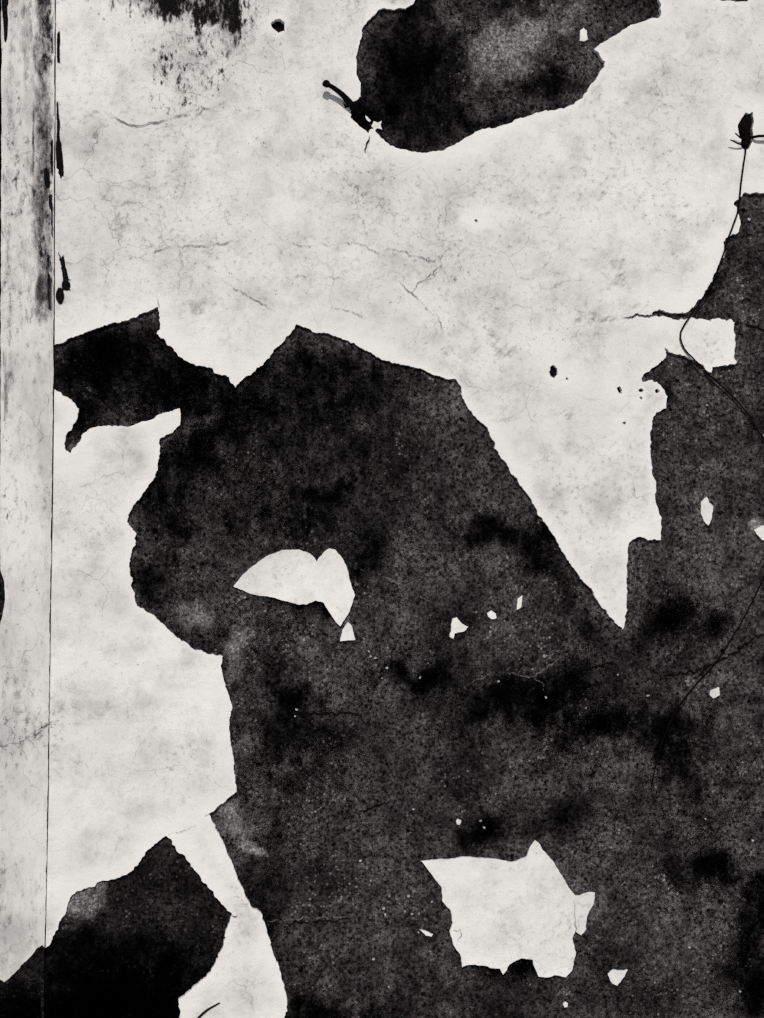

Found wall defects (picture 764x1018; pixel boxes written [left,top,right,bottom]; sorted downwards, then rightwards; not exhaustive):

water stain [2,0,15,42]
water stain [129,0,253,57]
water stain [153,46,194,106]
peeling [343,0,659,153]
water stain [13,0,70,313]
peeling [98,308,160,333]
crack [734,322,764,331]
peeling [54,335,162,427]
peeling [65,429,85,453]
peeling [127,193,764,1018]
crack [645,634,763,677]
peeling [0,836,232,1018]